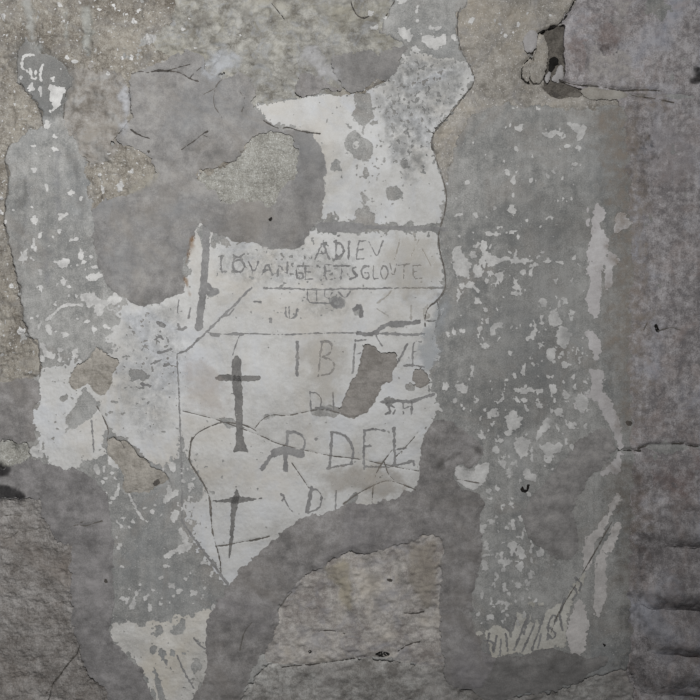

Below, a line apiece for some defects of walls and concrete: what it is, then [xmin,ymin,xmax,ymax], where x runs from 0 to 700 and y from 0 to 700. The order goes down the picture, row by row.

crack [559,79,674,103]
peeling [0,0,633,612]
spalling [0,497,108,700]
spalling [242,534,486,700]